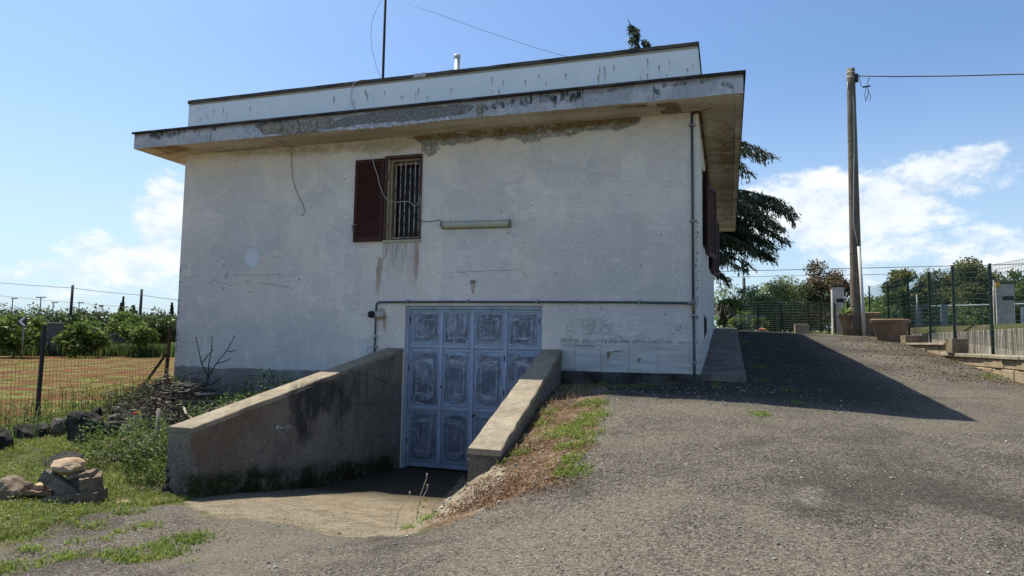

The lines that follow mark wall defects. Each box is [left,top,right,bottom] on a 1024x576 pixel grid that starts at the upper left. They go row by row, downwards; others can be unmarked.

peeling [211,104,492,152]
damp [291,379,356,438]
spalling [467,455,501,474]